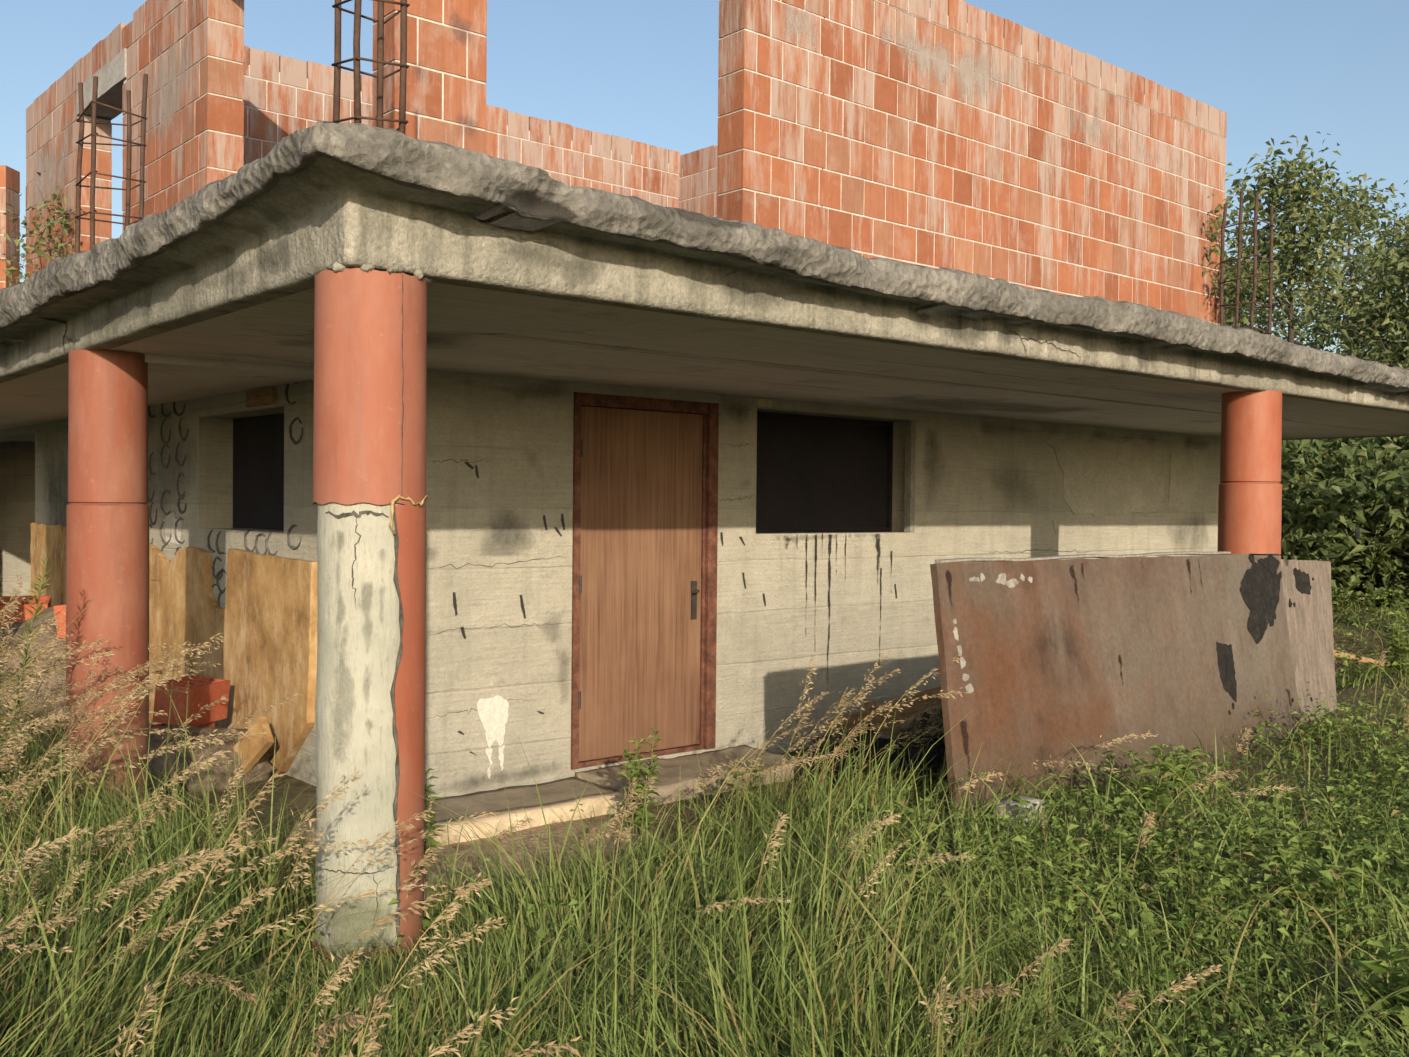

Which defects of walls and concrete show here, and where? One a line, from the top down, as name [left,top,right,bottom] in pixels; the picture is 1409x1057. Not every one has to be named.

crack [326,274,507,607]
crack [431,623,551,635]
crack [426,556,566,569]
leakage [784,534,846,661]
leakage [875,534,892,665]
peeling [1239,554,1328,644]
peeling [1216,642,1237,715]
peeling [390,507,404,959]
leakage [472,745,505,785]
crack [318,867,391,919]